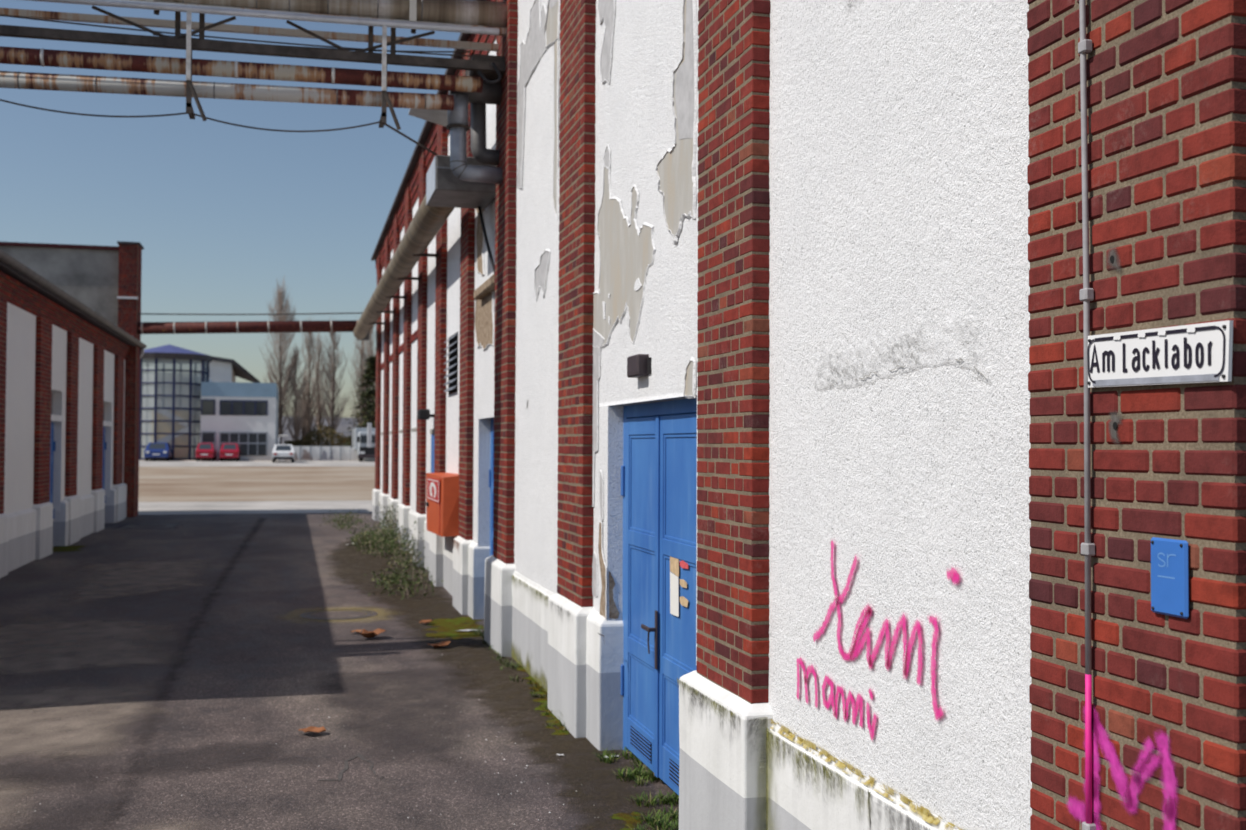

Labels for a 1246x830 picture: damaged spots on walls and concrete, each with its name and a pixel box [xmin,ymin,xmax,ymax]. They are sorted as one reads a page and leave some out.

peeling [517,0,560,219]
peeling [592,0,697,619]
leakage [750,718,841,781]